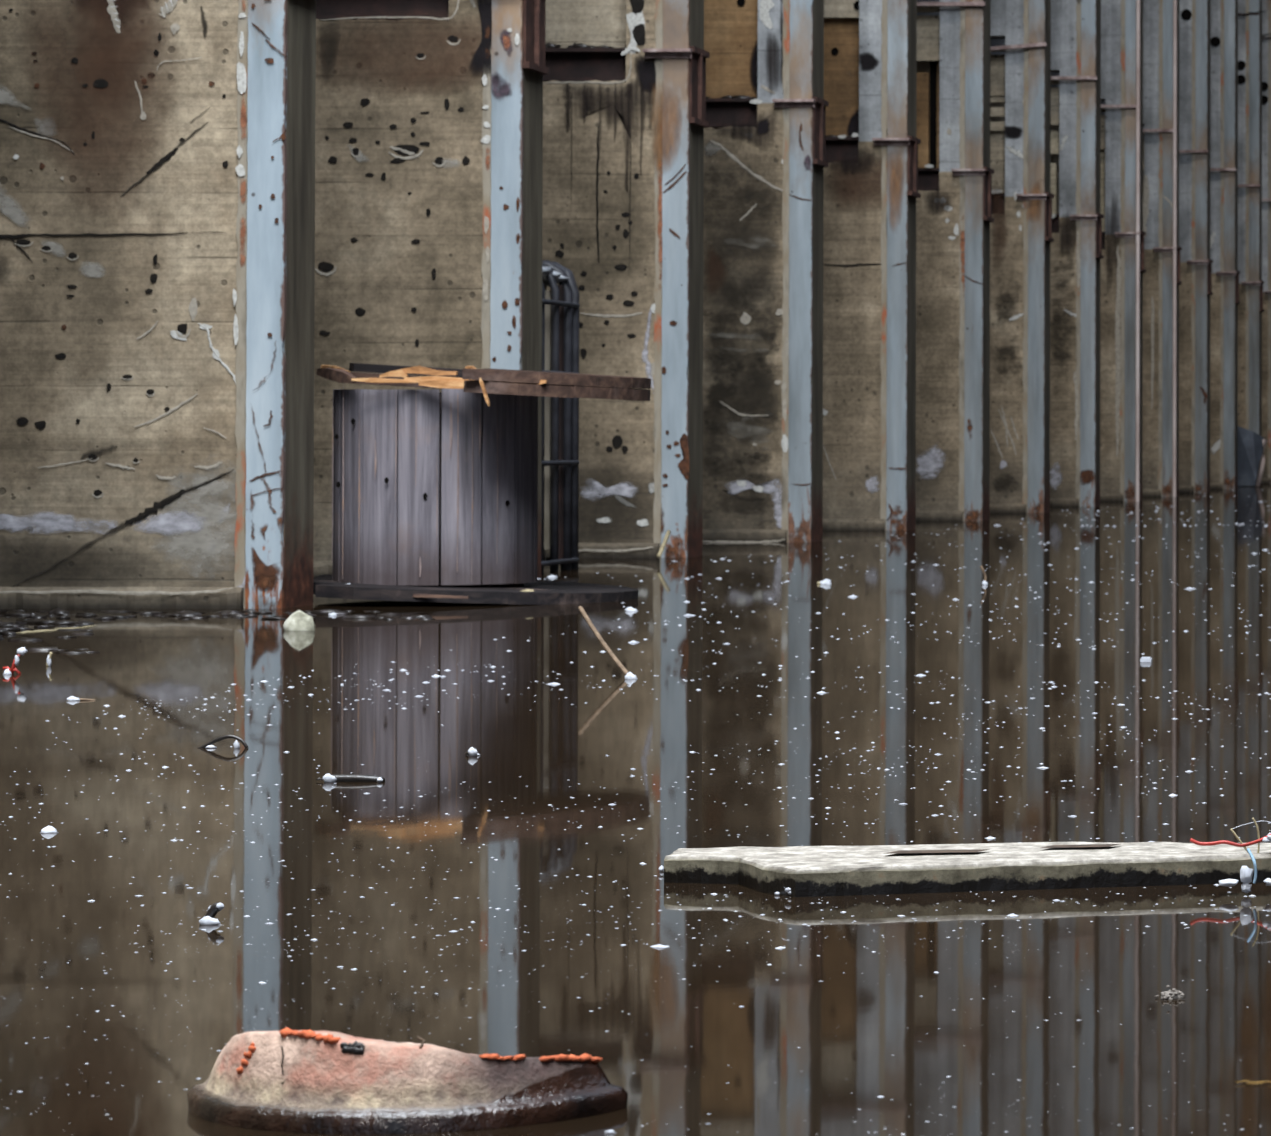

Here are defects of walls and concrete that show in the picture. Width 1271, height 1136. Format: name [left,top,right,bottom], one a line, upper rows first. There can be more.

peeling [543,0,646,84]
water stain [566,83,651,191]
crack [13,469,282,587]
corrosion [251,517,282,589]
corrosion [665,543,681,558]